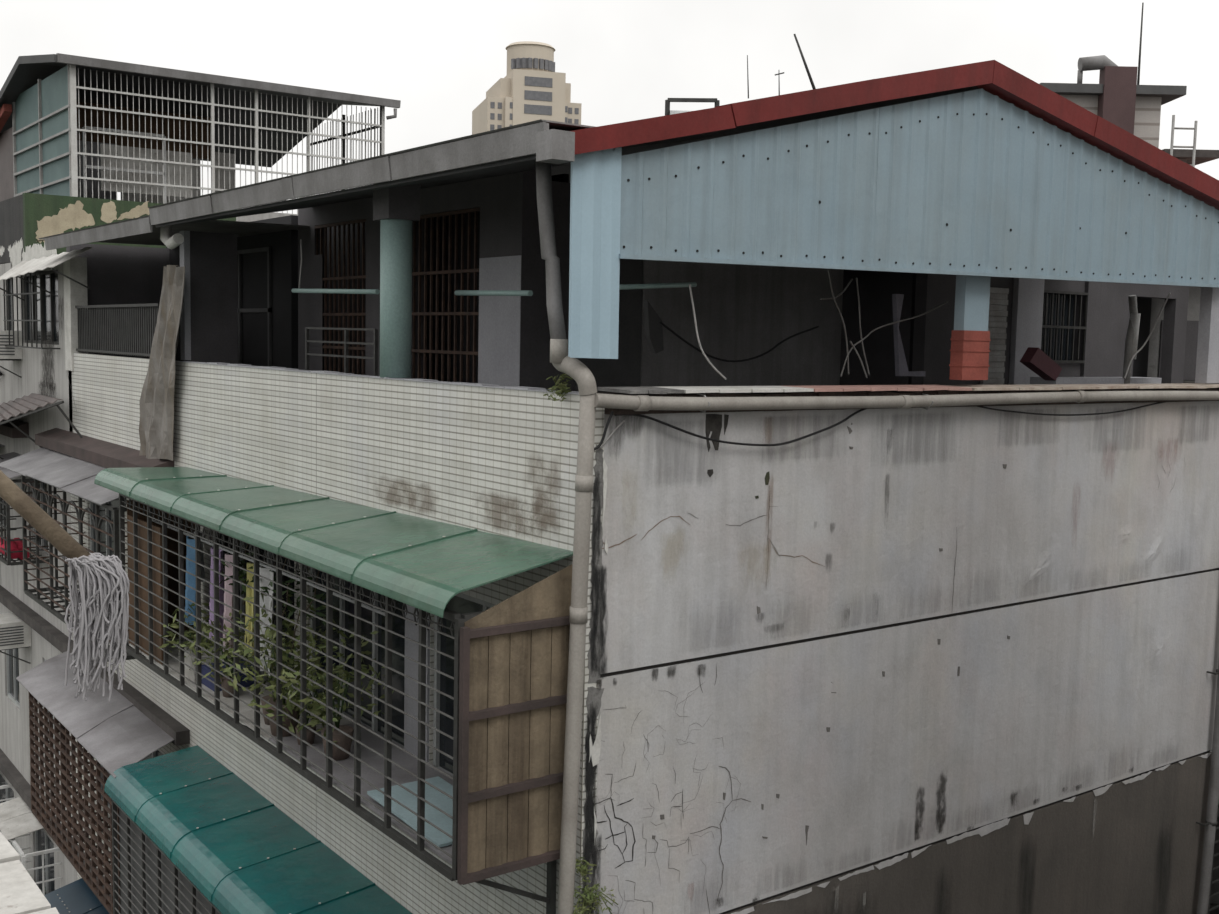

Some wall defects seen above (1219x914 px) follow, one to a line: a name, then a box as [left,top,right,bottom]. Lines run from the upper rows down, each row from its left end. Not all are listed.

peeling [0,201,150,269]
crack [602,513,697,549]
crack [726,485,825,583]
peeling [581,444,608,914]
crack [576,667,751,914]
water stain [915,776,946,840]
peeling [946,812,1034,844]
peeling [1093,753,1211,796]
peeling [731,845,931,914]